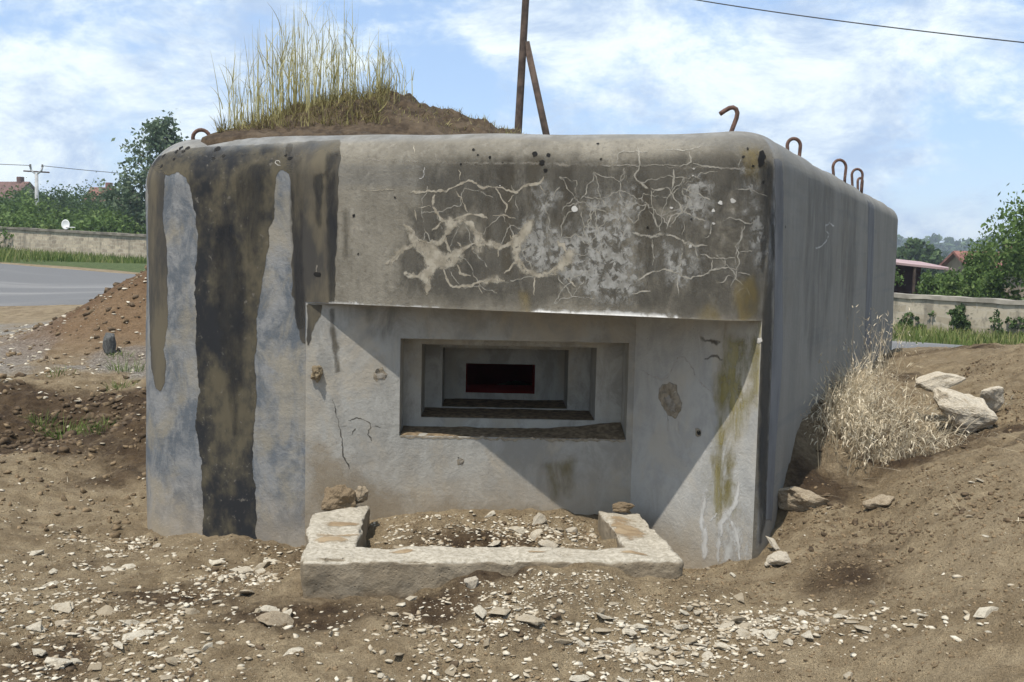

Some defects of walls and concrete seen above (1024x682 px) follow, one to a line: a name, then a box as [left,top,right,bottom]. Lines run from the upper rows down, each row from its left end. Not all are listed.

crack [365,145,756,304]
damp [147,142,364,539]
crack [332,400,378,469]
damp [402,155,775,562]
spalling [658,382,682,434]